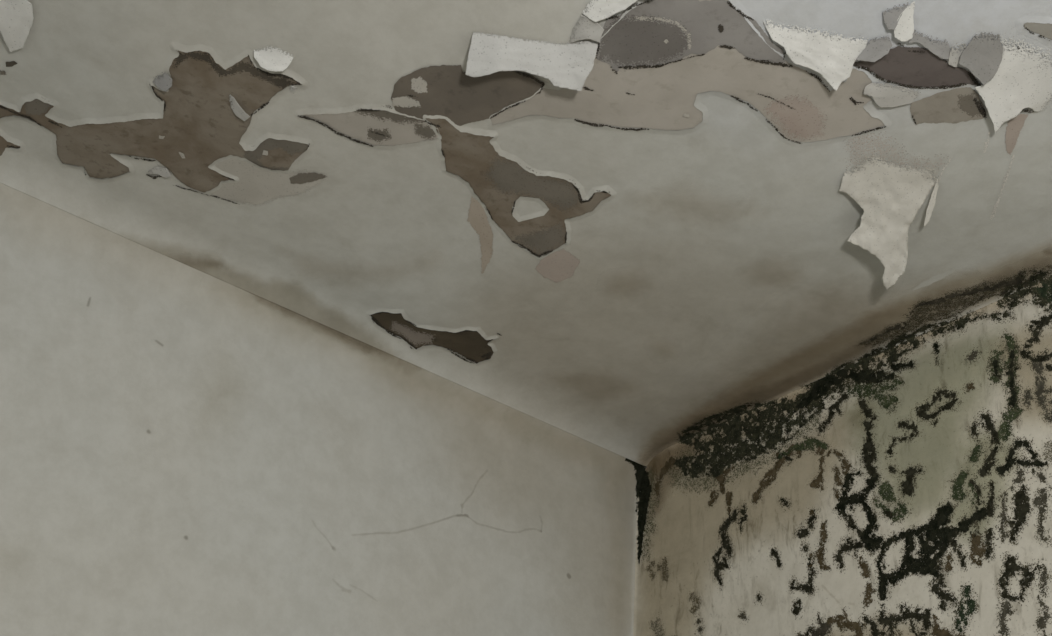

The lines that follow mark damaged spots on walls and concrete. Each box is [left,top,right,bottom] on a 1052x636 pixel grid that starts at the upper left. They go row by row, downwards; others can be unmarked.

peeling [0,0,34,75]
peeling [0,41,327,207]
peeling [294,0,1052,290]
peeling [366,307,502,366]
mould [625,266,1052,636]